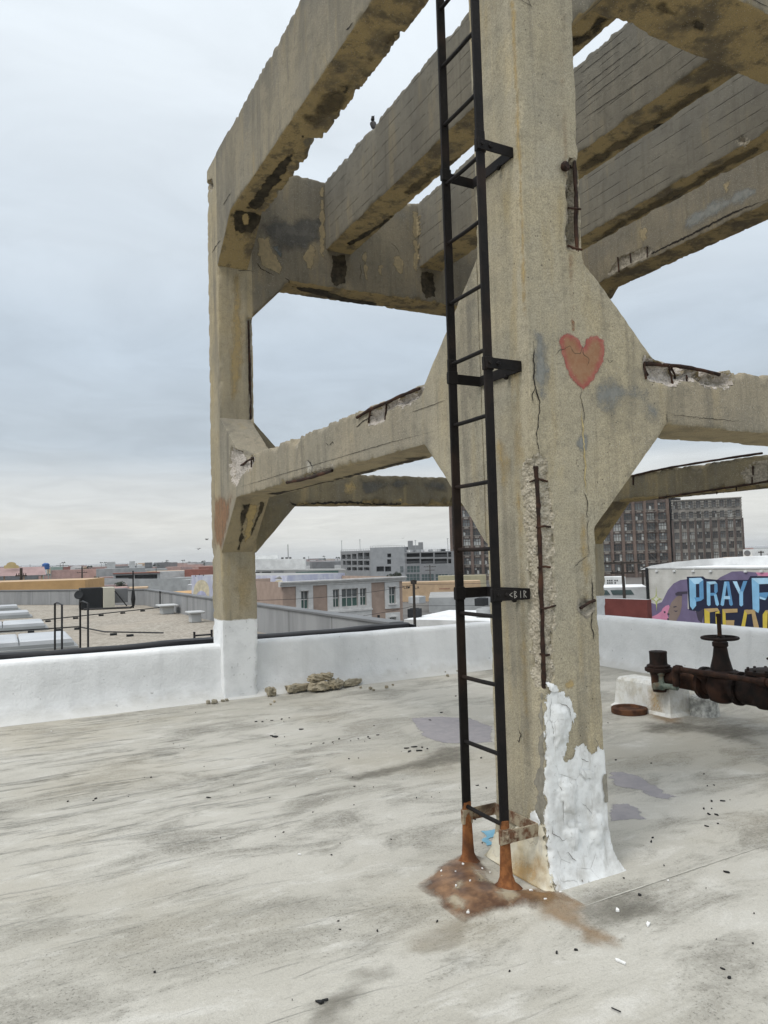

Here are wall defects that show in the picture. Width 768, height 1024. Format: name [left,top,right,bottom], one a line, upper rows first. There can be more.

spalling [564,157,583,252]
spalling [356,386,425,426]
crack [532,342,613,449]
spalling [643,355,733,390]
spalling [229,446,255,487]
peeling [244,504,257,542]
crack [575,493,594,638]
peeling [487,453,626,892]
corrosion [426,856,579,923]